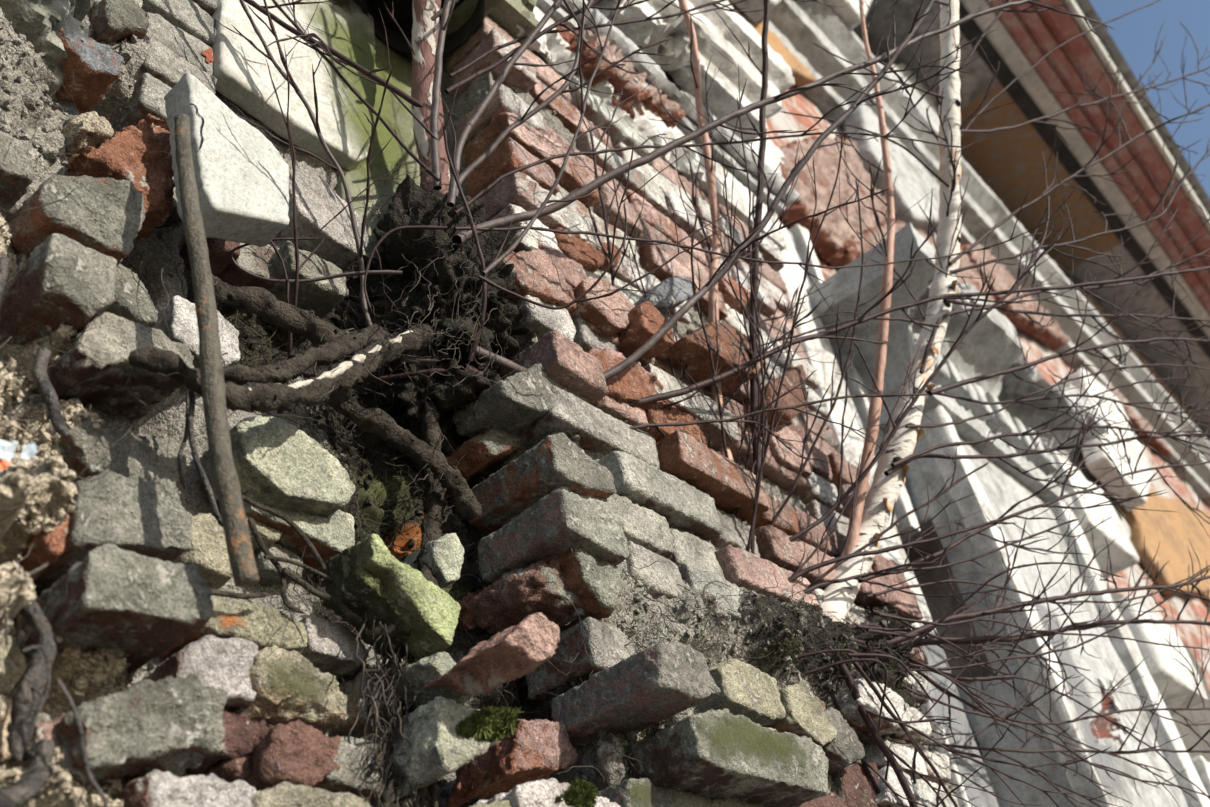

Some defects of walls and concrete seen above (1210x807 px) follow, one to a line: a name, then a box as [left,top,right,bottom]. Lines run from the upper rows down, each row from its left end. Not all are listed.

spalling [202,48,214,63]